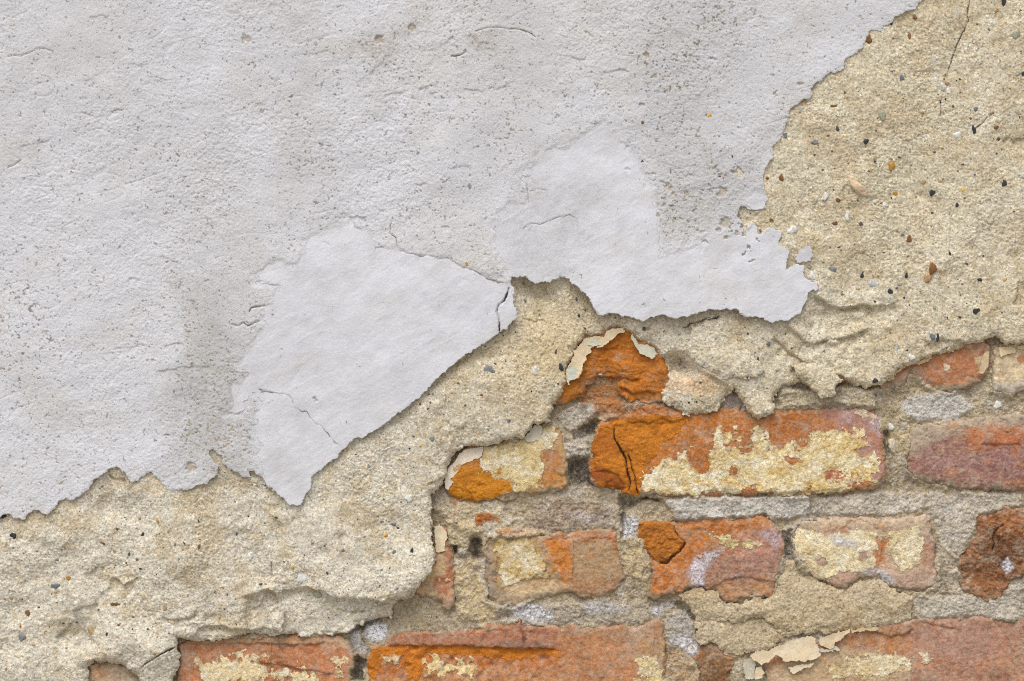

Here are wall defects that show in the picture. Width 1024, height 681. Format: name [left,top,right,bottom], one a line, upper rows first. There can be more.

crack [948,1,970,70]
crack [390,222,509,332]
peeling [227,216,517,505]
peeling [566,328,625,385]
flaking render [687,317,765,380]
flaking render [790,362,843,399]
peeling [448,425,559,502]
crack [613,429,638,495]
peeling [590,414,882,497]
flaking render [678,525,934,681]
peeling [194,648,349,681]
spalling [367,644,560,681]